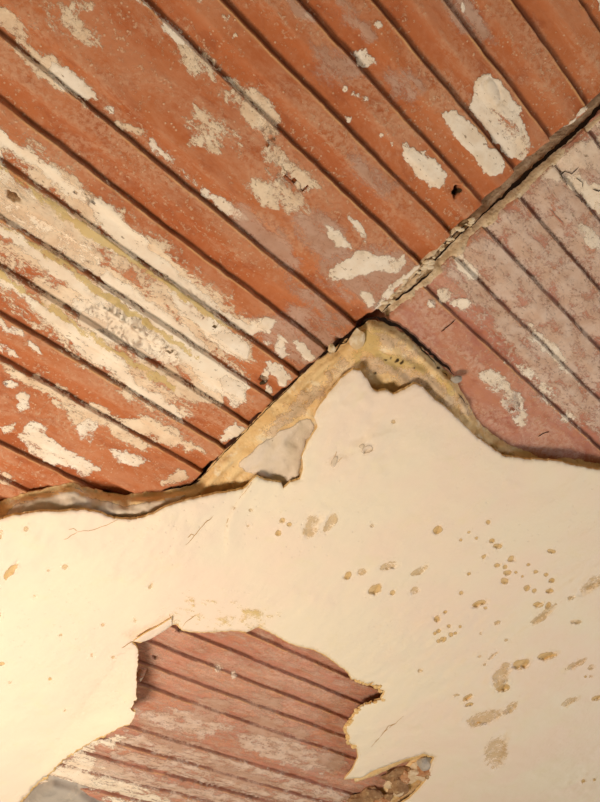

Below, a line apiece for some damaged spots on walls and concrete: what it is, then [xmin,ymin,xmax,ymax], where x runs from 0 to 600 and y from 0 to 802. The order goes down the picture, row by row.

peeling [47,62,98,100]
peeling [353,48,376,68]
peeling [149,138,175,163]
peeling [183,170,249,221]
crack [162,104,600,491]
peeling [257,317,315,394]
peeling [239,359,349,486]
peeling [0,488,184,518]
hole [494,556,557,624]
spalling [132,618,386,757]
spalling [492,652,556,692]
spalling [344,754,433,802]